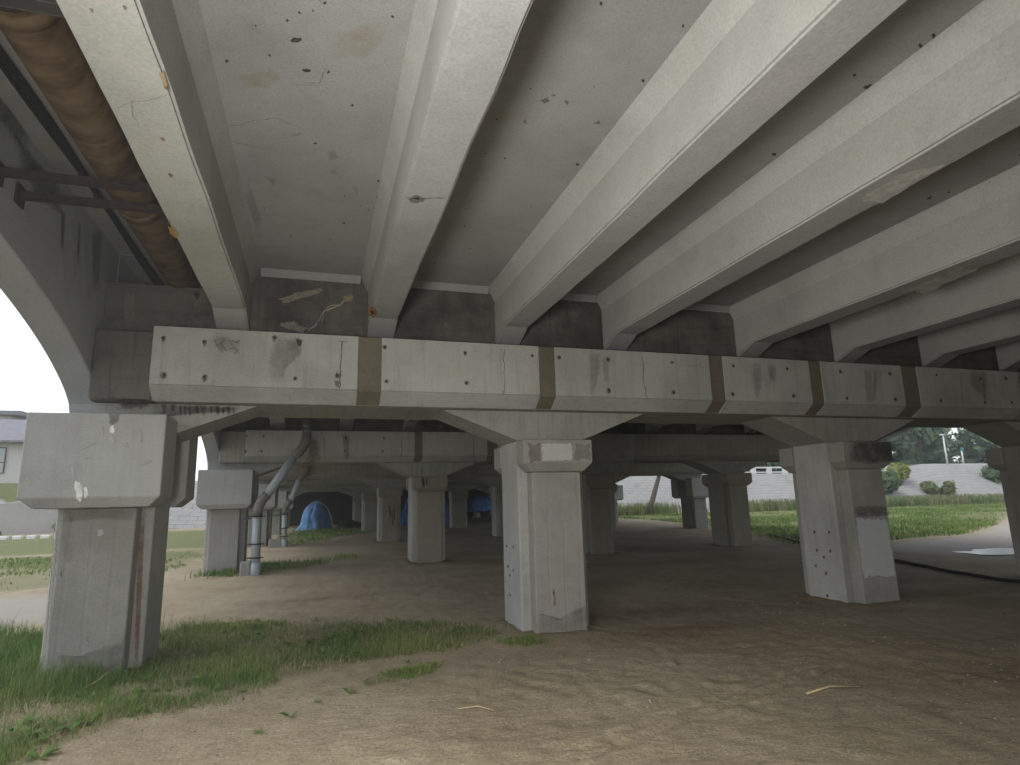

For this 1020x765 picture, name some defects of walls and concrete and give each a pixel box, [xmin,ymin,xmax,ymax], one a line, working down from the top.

crack [335,341,348,389]